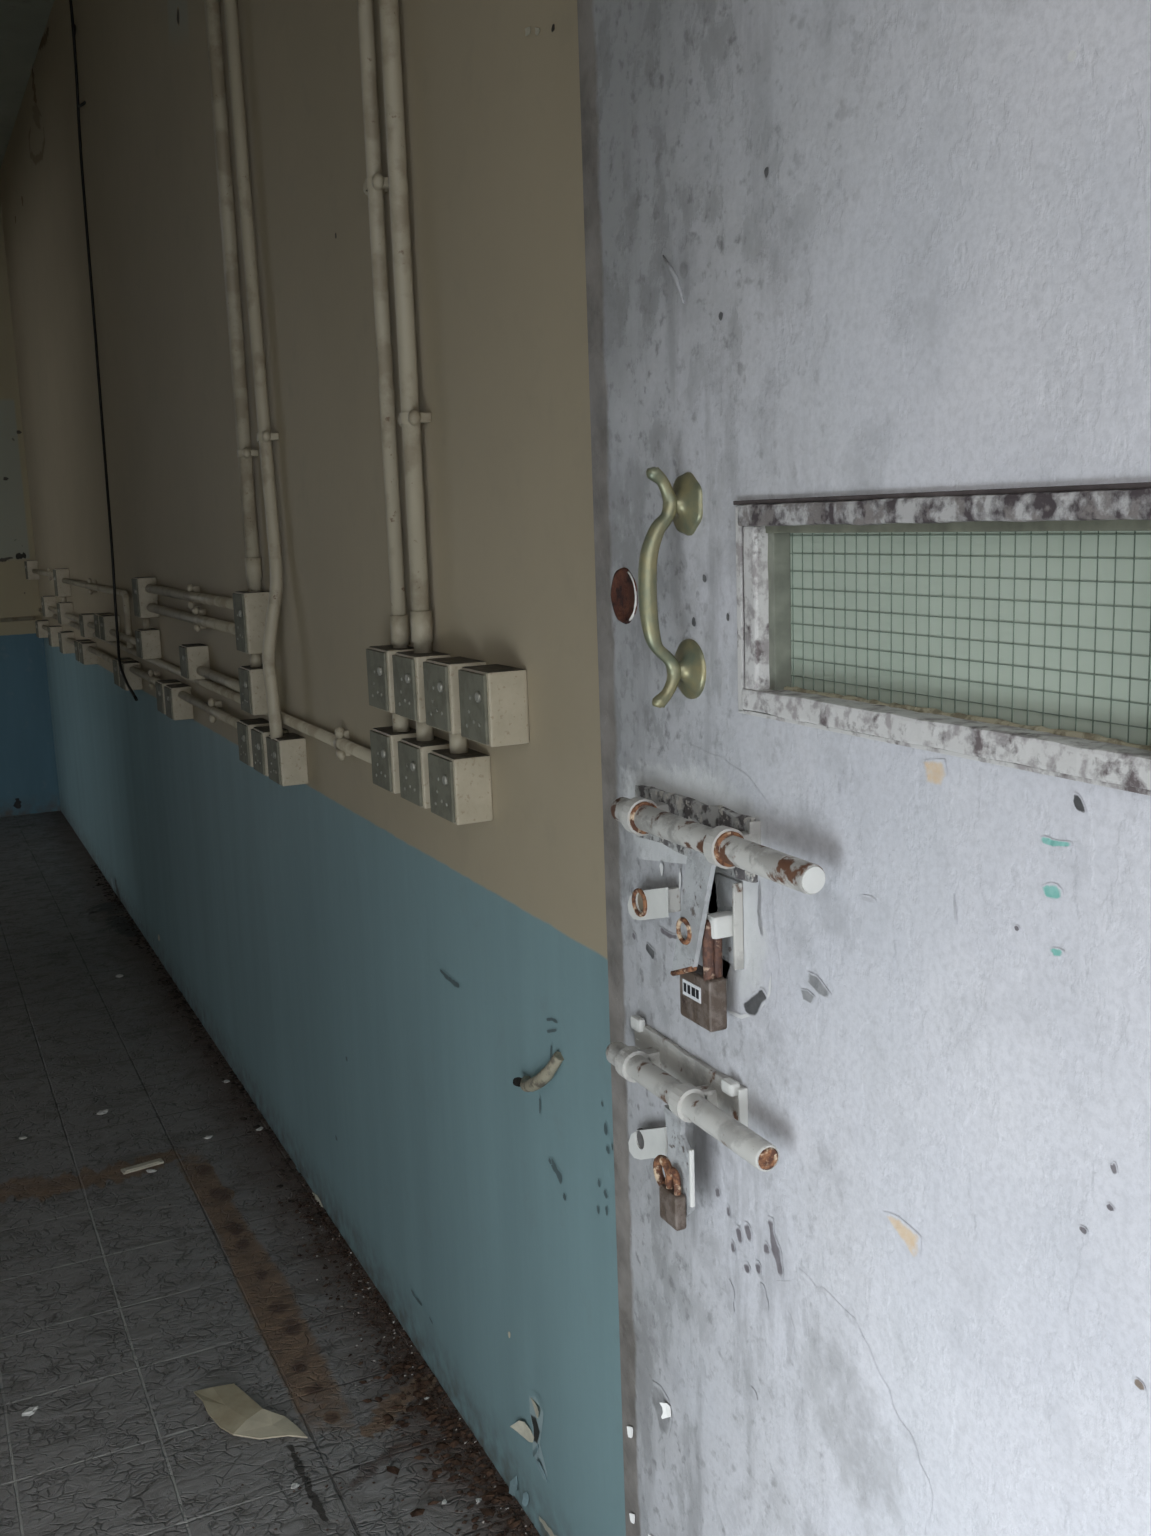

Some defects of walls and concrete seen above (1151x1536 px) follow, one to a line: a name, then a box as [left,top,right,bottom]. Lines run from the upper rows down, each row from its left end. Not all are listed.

corrosion [676,917,692,945]
corrosion [670,966,697,976]
corrosion [653,1155,672,1186]
peeling [509,1388,558,1536]